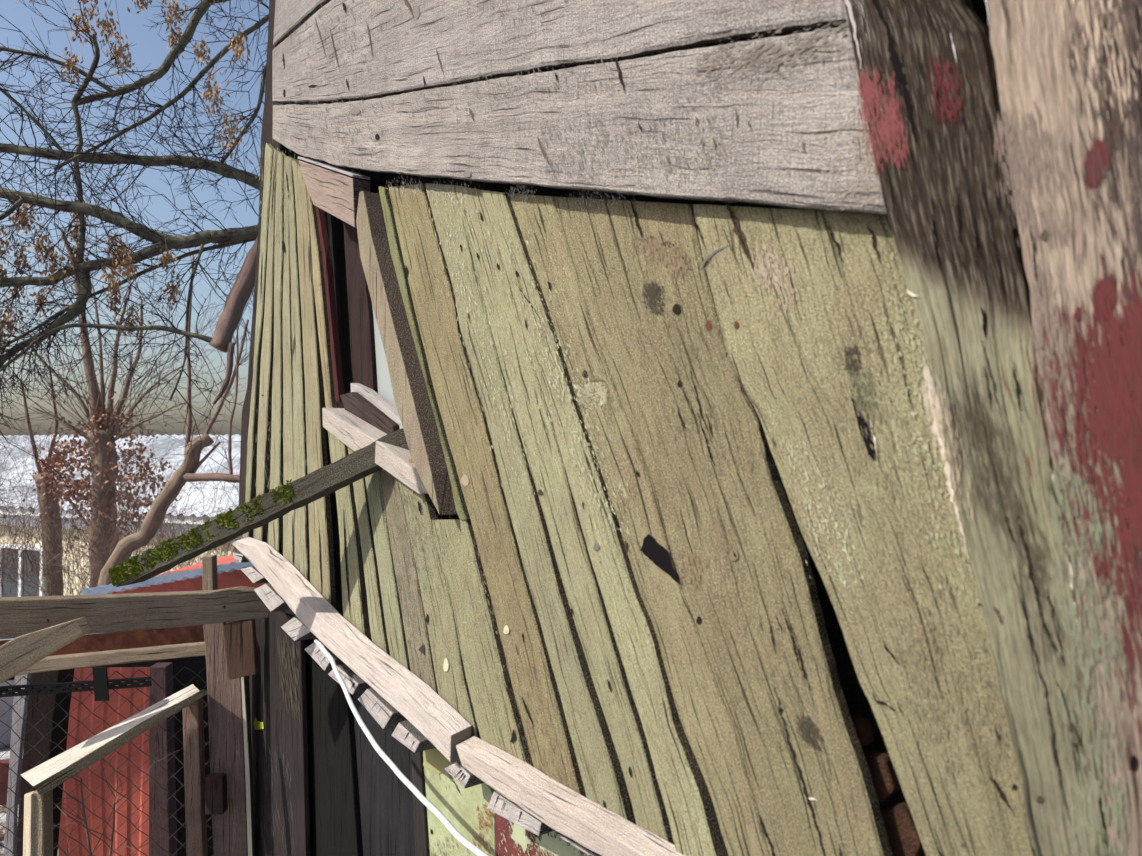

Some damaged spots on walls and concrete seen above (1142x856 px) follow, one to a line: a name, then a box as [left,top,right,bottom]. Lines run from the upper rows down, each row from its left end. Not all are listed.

peeling [856,64,910,177]
peeling [926,33,963,131]
peeling [1026,252,1142,774]
crack [881,636,899,664]
crack [757,608,841,856]
crack [872,693,920,722]
peeling [498,822,588,856]